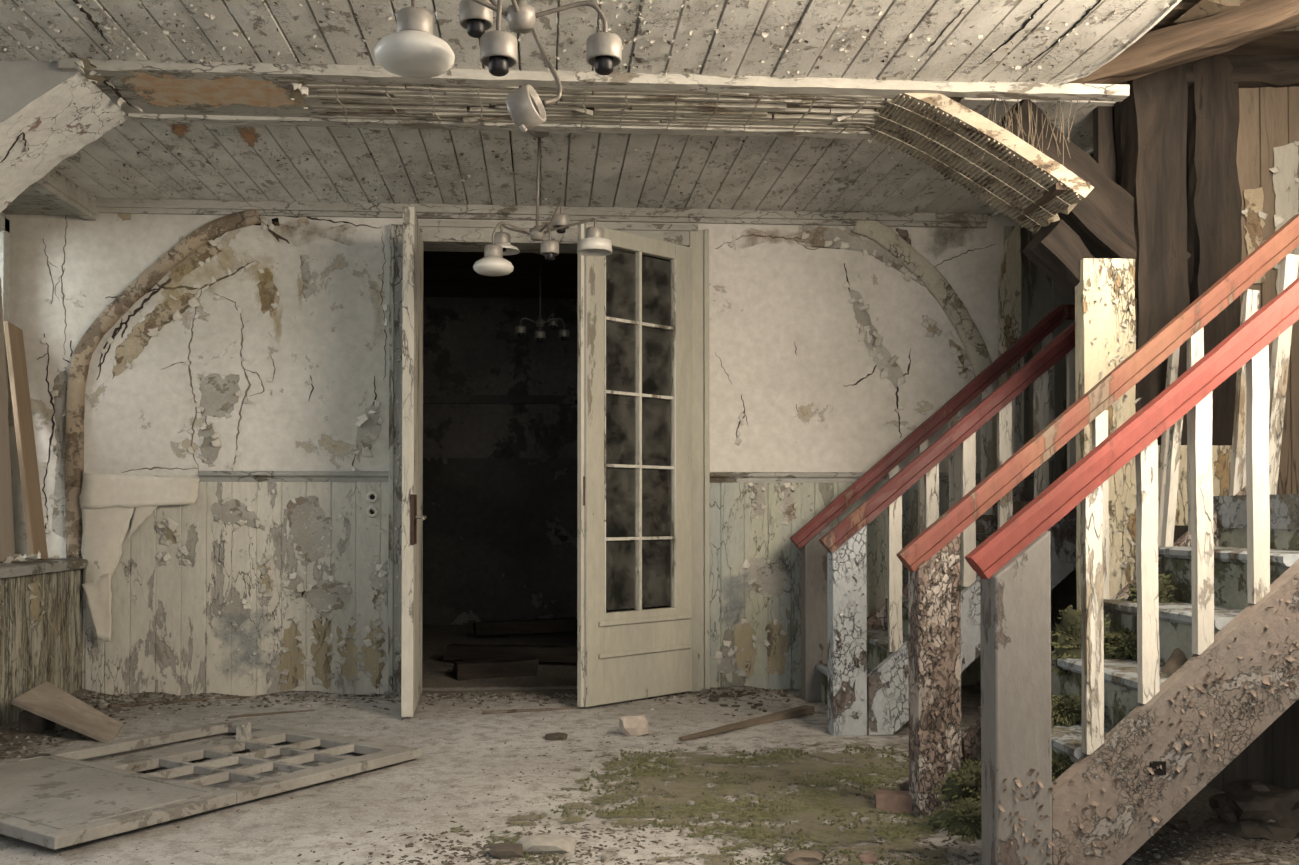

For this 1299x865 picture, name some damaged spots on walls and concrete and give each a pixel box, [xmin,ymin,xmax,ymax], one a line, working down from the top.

peeling [0,0,376,109]
peeling [518,0,1118,86]
crack [0,132,29,163]
peeling [1241,141,1299,255]
spalling [110,240,222,379]
peeling [255,268,280,319]
peeling [196,373,241,467]
peeling [354,400,384,458]
crack [843,325,911,438]
peeling [154,517,192,567]
peeling [748,482,797,526]
peeling [918,558,963,786]